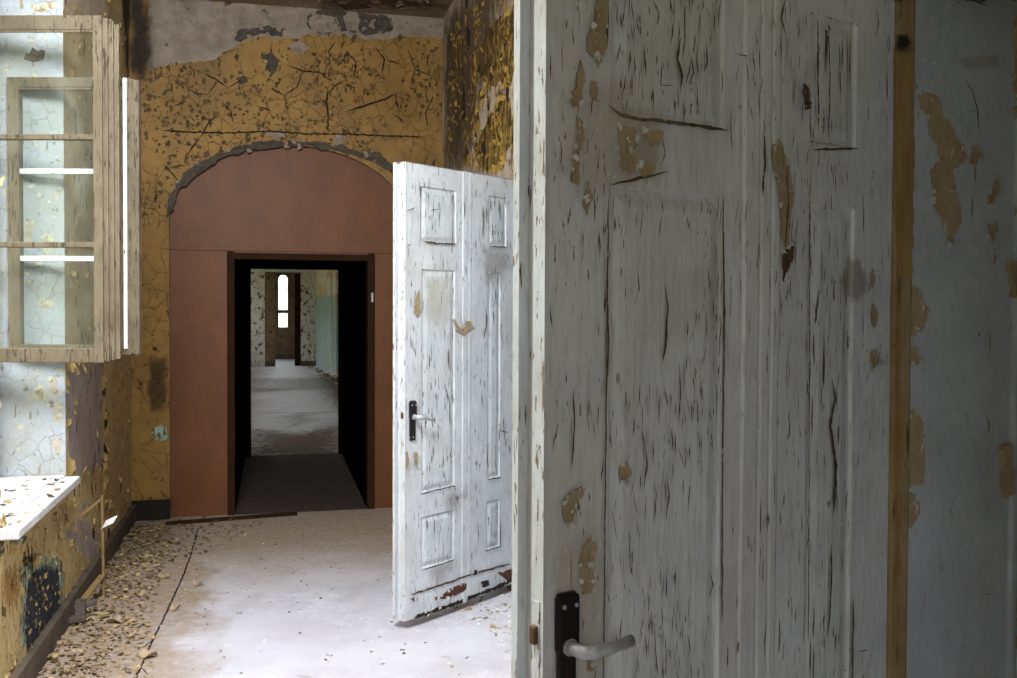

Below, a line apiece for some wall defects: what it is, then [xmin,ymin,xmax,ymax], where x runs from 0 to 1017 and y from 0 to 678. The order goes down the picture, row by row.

peeling [23,219,59,284]
flaking render [140,0,514,218]
peeling [414,289,422,317]
peeling [442,288,498,336]
peeling [566,0,610,215]
peeling [617,123,665,177]
peeling [772,138,796,282]
peeling [803,84,814,110]
peeling [914,81,987,248]
peeling [405,437,431,471]
crack [136,528,199,678]
peeling [410,488,512,619]